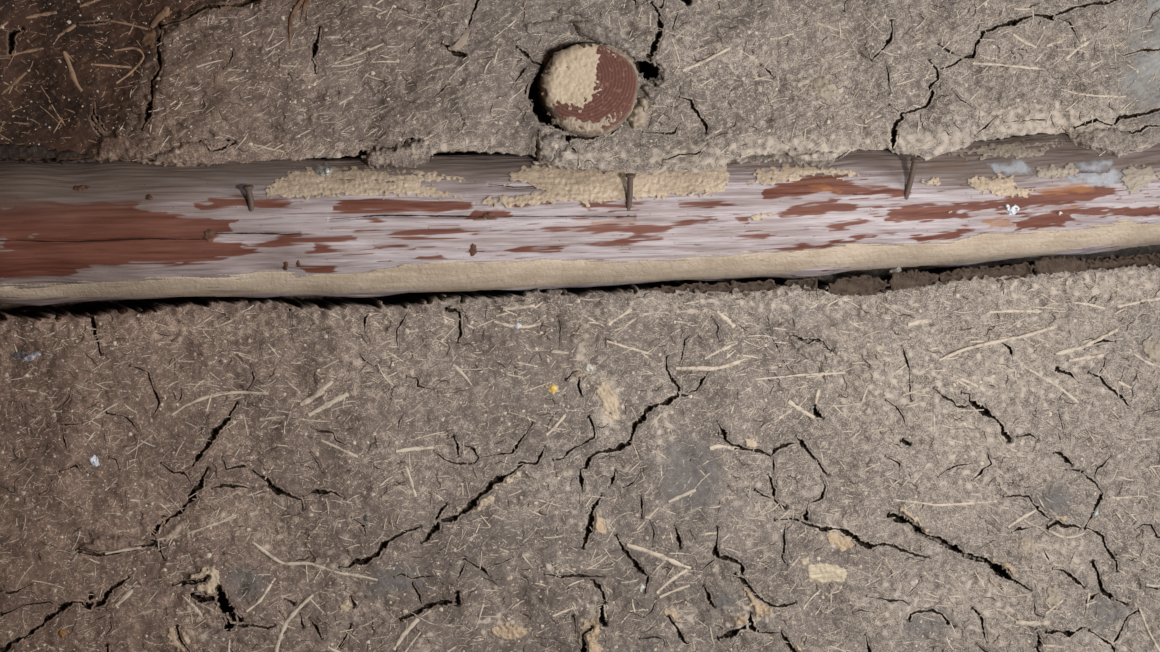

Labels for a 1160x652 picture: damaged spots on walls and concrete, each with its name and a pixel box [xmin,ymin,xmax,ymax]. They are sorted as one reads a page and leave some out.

crack [859,0,1160,149]
peeling [361,137,434,169]
crack [0,271,1160,652]